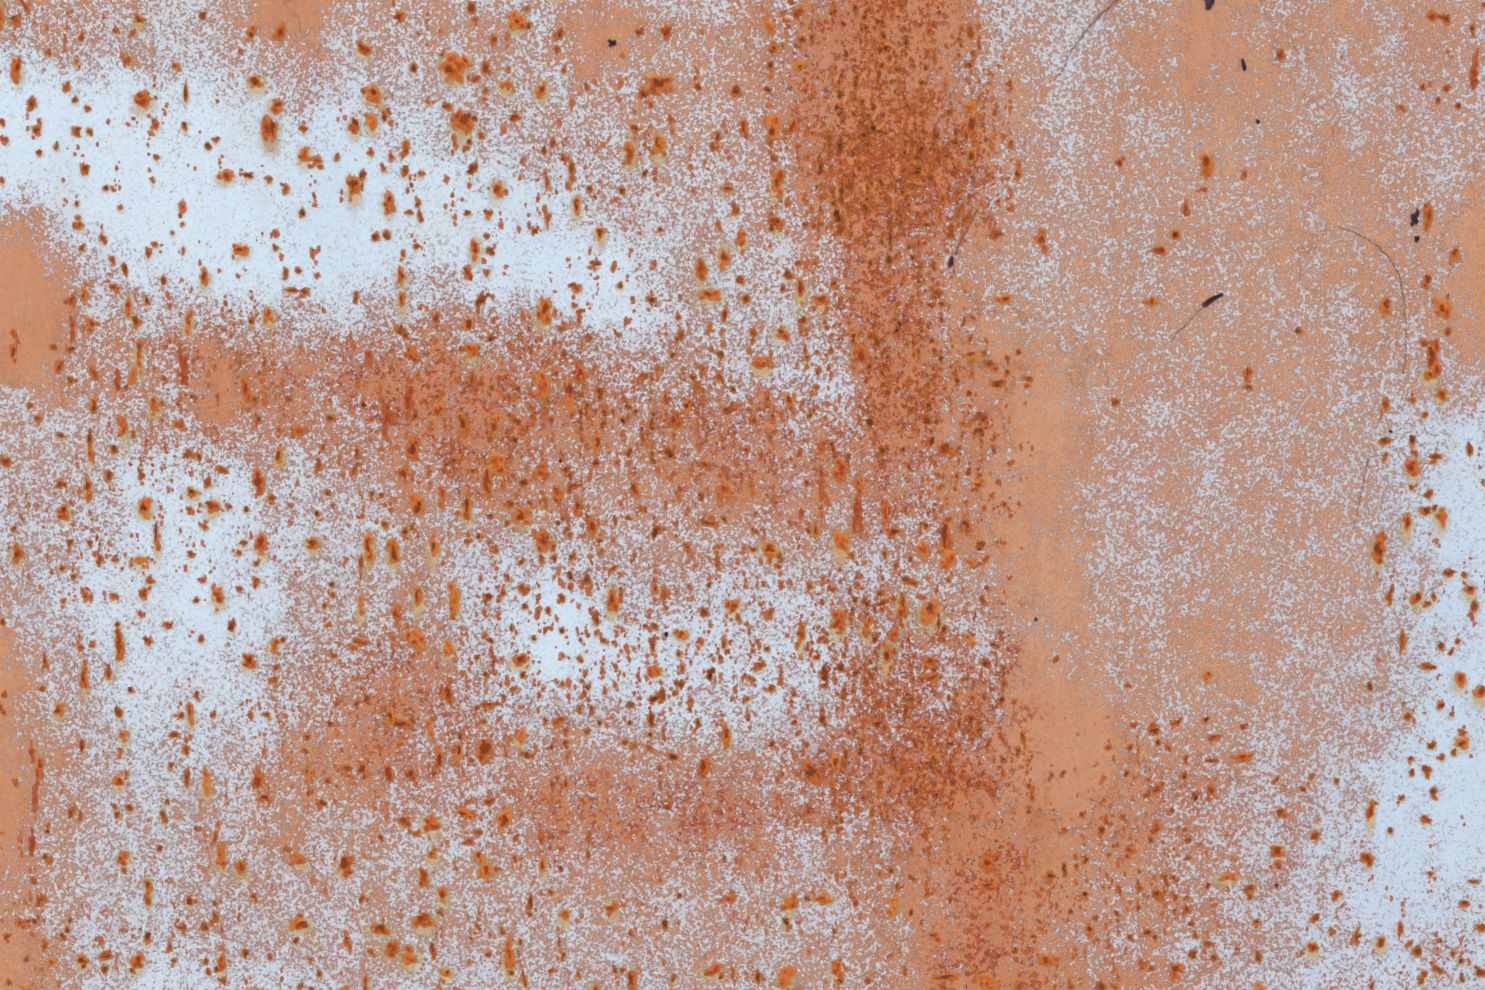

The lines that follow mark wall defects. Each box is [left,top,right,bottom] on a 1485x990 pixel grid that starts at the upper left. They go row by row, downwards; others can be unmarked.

rust [26,95,99,176]
rust [145,199,200,258]
rust [181,122,290,195]
rust [256,229,302,281]
rust [339,159,367,204]
rust [383,190,396,215]
rust [380,131,419,172]
rust [400,165,426,222]
rust [470,239,496,277]
rust [1455,672,1485,703]
rust [1408,725,1473,801]
rust [1397,898,1485,990]